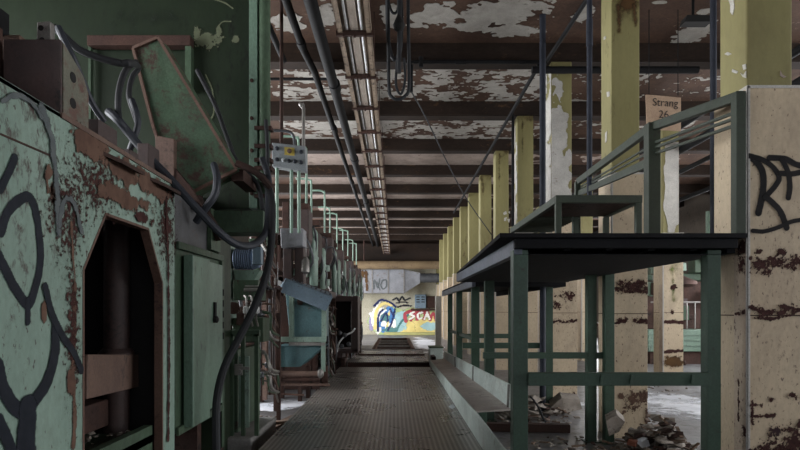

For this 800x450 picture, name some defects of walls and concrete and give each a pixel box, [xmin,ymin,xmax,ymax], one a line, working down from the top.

peeling [379,0,557,38]
peeling [270,69,352,101]
peeling [279,121,359,139]
peeling [375,69,607,202]
peeling [380,121,517,225]
peeling [663,142,681,232]
corrosion [736,239,800,277]
corrosion [70,120,175,442]
corrosion [615,276,648,295]
corrosion [734,303,800,322]
corrosion [663,349,684,367]
corrosion [737,379,800,450]